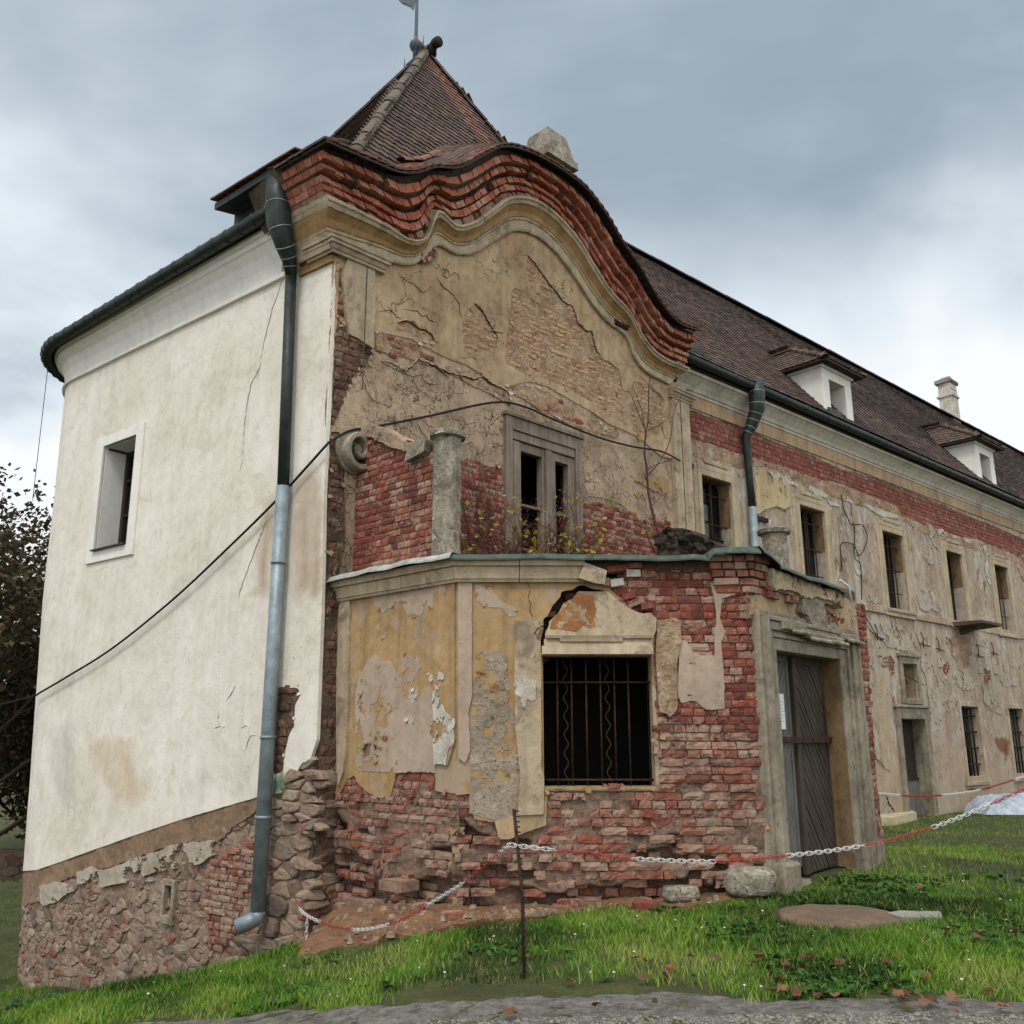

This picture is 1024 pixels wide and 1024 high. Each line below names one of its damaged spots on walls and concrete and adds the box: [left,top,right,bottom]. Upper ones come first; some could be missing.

flaking render [314,256,769,914]